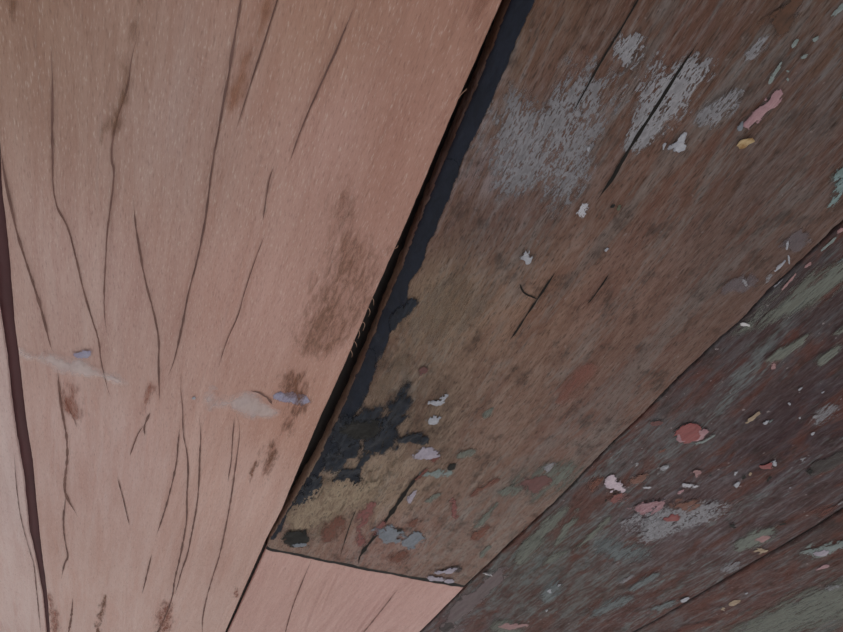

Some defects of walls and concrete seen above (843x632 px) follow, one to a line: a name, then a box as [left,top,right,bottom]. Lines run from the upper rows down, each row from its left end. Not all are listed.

crack [1,154,53,351]
crack [51,35,139,392]
crack [130,0,277,455]
damp [271,0,535,540]
crack [597,44,697,200]
peeling [662,132,687,153]
peeling [737,62,789,149]
crack [58,376,77,574]
crack [157,396,201,632]
peeling [428,394,448,425]
peeling [407,447,476,504]
peeling [604,463,733,543]